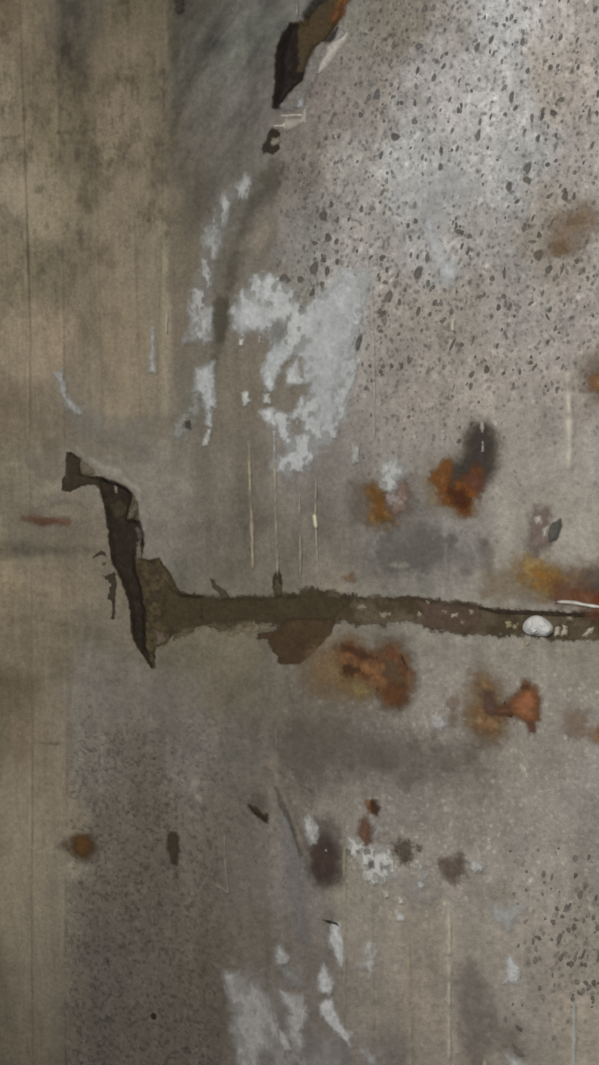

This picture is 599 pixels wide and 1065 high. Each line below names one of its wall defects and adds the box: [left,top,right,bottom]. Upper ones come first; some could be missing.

spalling [262,0,349,154]
spalling [361,37,463,133]
spalling [474,7,529,161]
spalling [496,159,561,223]
water stain [189,168,366,472]
water stain [175,359,216,446]
rust [428,422,497,516]
crack [93,551,117,619]
crack [162,579,599,646]
rust [484,507,599,617]
rust [309,641,414,707]
rust [447,674,540,741]